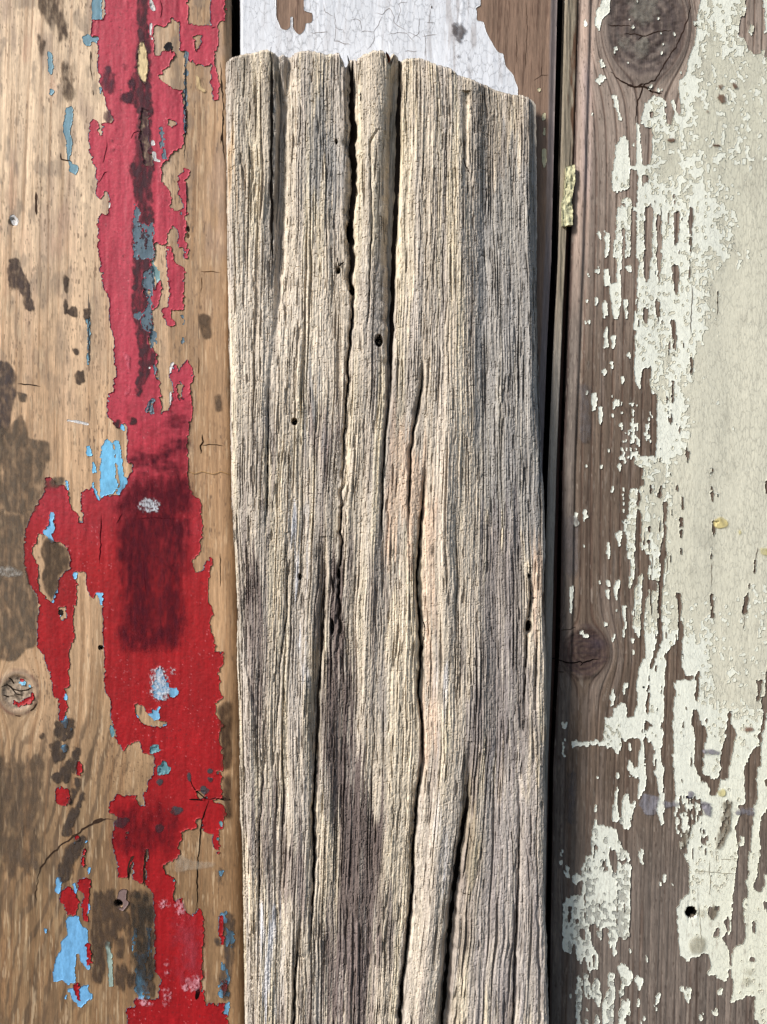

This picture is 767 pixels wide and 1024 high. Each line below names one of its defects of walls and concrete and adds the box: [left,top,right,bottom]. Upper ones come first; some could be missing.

peeling [240,0,518,95]
crack [608,0,691,119]
peeling [23,0,230,1024]
crack [311,2,435,1024]
peeling [559,0,767,1024]
peeling [13,678,34,707]
crack [189,781,230,913]
peeling [217,911,235,947]
crack [440,773,475,1024]